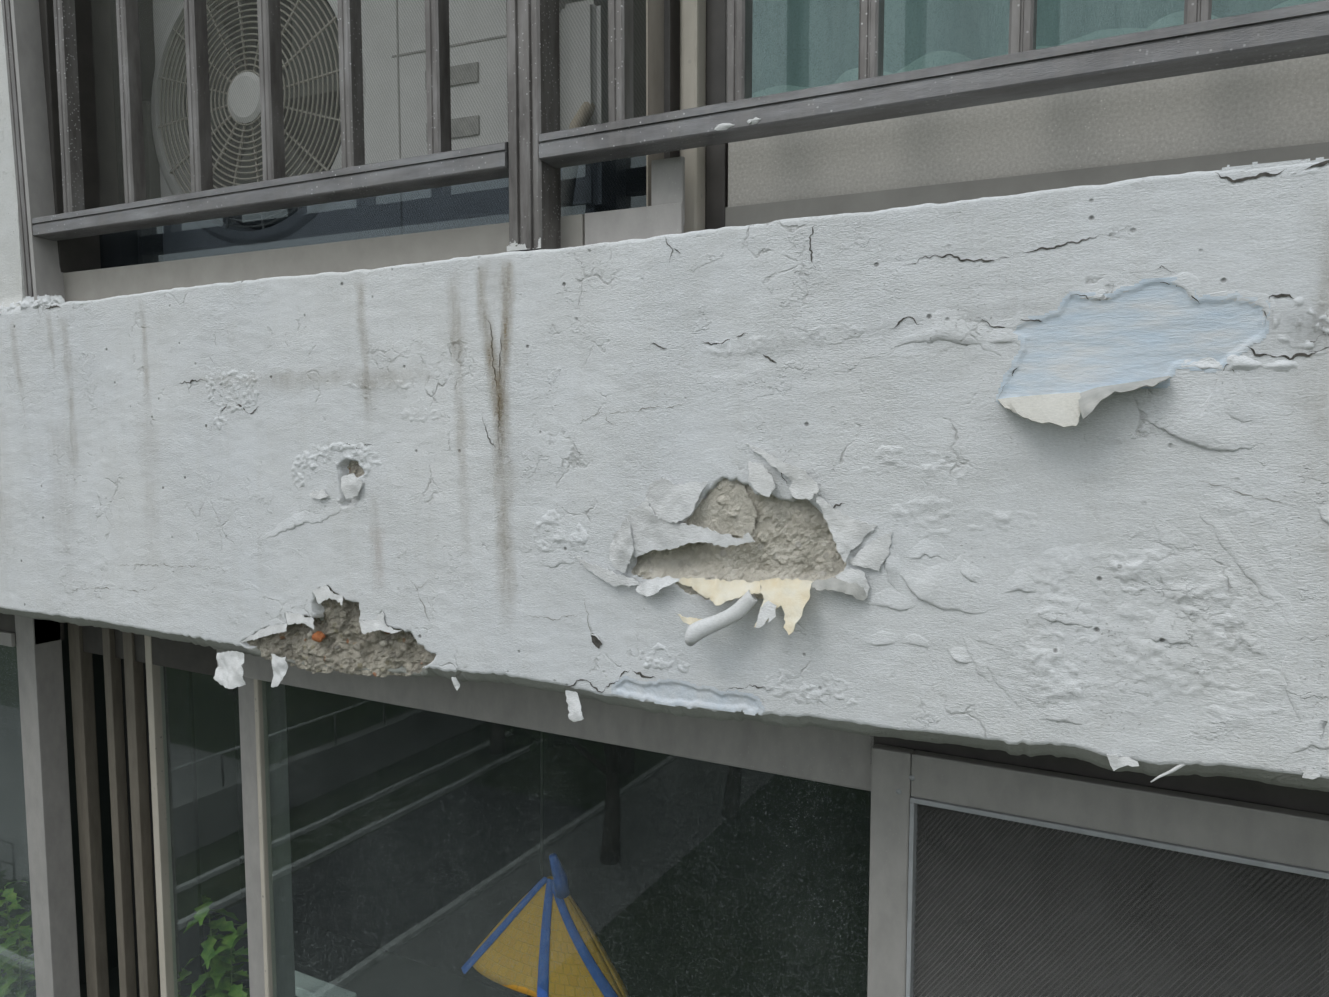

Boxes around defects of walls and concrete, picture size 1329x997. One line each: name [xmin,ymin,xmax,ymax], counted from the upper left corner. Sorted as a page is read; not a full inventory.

crack [888,226,1129,270]
peeling [975,265,1329,428]
peeling [259,442,382,542]
spalling [531,443,893,722]
spalling [214,585,436,689]